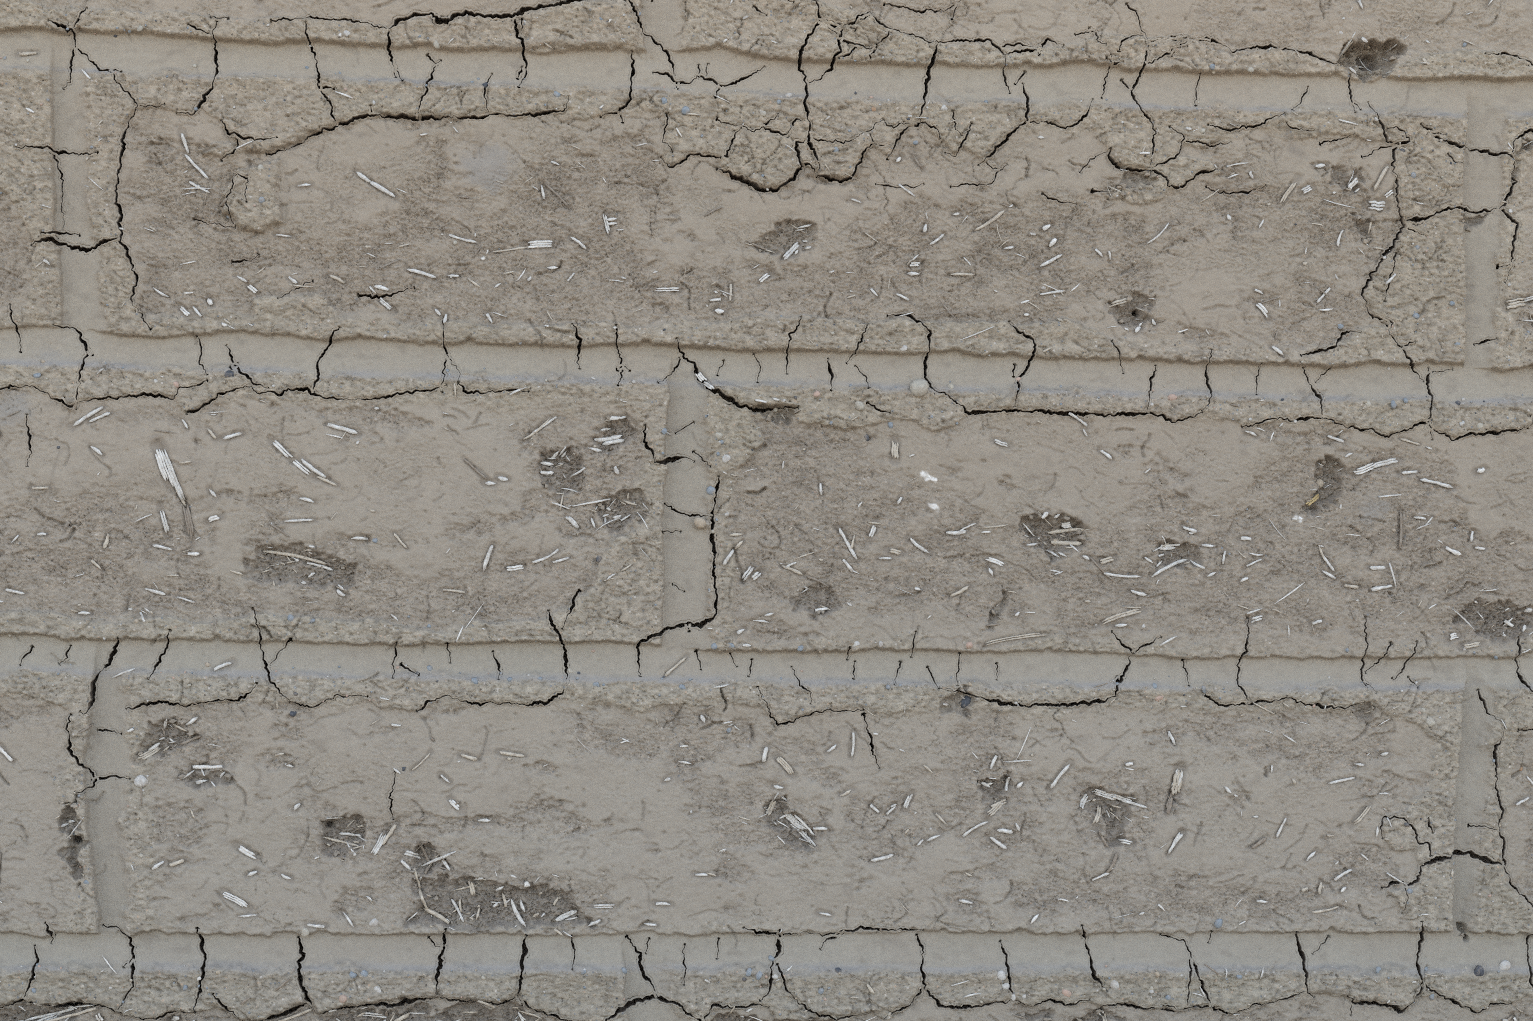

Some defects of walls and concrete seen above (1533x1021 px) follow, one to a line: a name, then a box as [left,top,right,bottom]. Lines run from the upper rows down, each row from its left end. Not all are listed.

crack [0,286,528,466]
crack [19,590,580,795]
crack [0,638,1533,1021]
crack [14,0,1533,443]
crack [571,312,1214,768]
crack [893,618,1420,711]